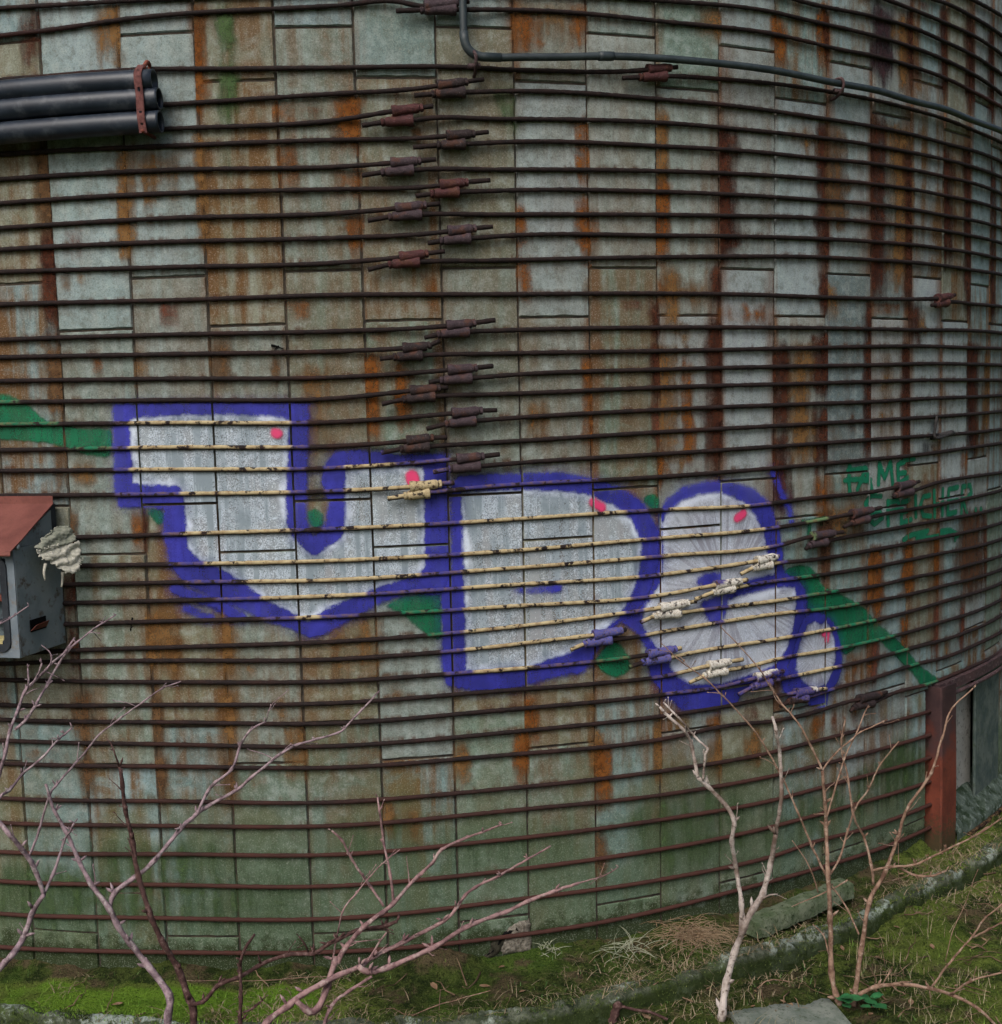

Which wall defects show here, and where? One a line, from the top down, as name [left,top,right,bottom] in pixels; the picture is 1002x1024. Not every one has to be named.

corrosion [194,4,207,114]
corrosion [335,95,361,145]
corrosion [964,17,994,119]
corrosion [35,145,82,413]
corrosion [635,110,741,486]
corrosion [851,117,925,461]
corrosion [944,145,971,322]
corrosion [962,342,990,475]
corrosion [144,607,179,676]
corrosion [152,695,167,804]
corrosion [513,695,539,783]
corrosion [587,694,612,809]